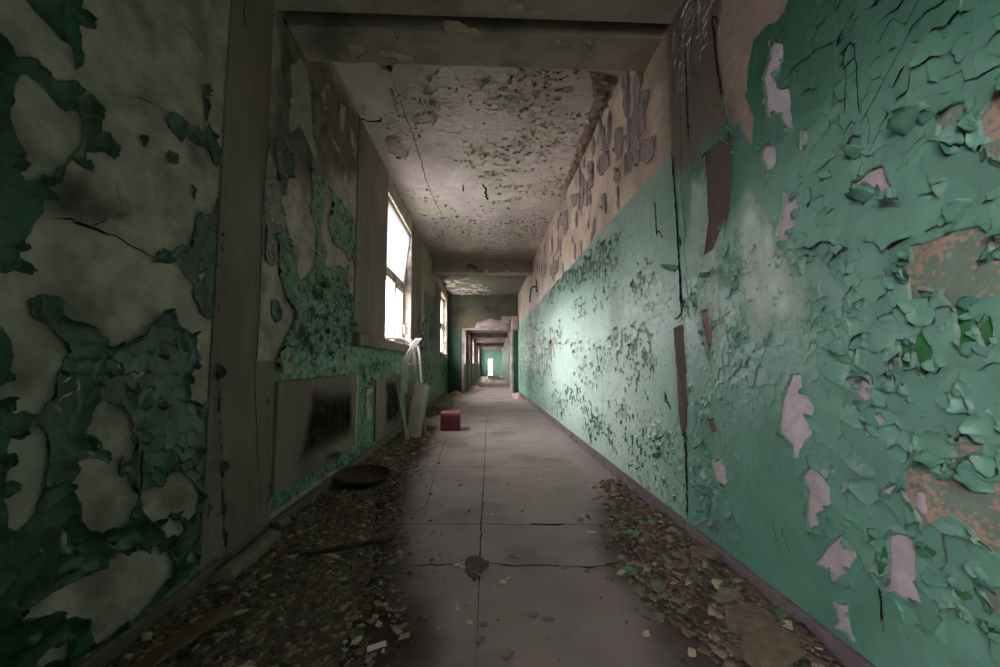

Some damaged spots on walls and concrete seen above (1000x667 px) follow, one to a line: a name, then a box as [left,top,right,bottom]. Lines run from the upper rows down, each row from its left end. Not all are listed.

peeling [0,0,121,275]
crack [49,185,154,258]
peeling [0,294,230,667]
peeling [263,57,448,515]
crack [361,78,443,218]
flaking render [379,63,655,273]
crack [491,562,616,570]
spalling [519,227,676,502]
crack [681,432,689,520]
flaking render [700,0,810,256]
flaking render [775,375,814,457]
flaking render [864,434,1000,606]